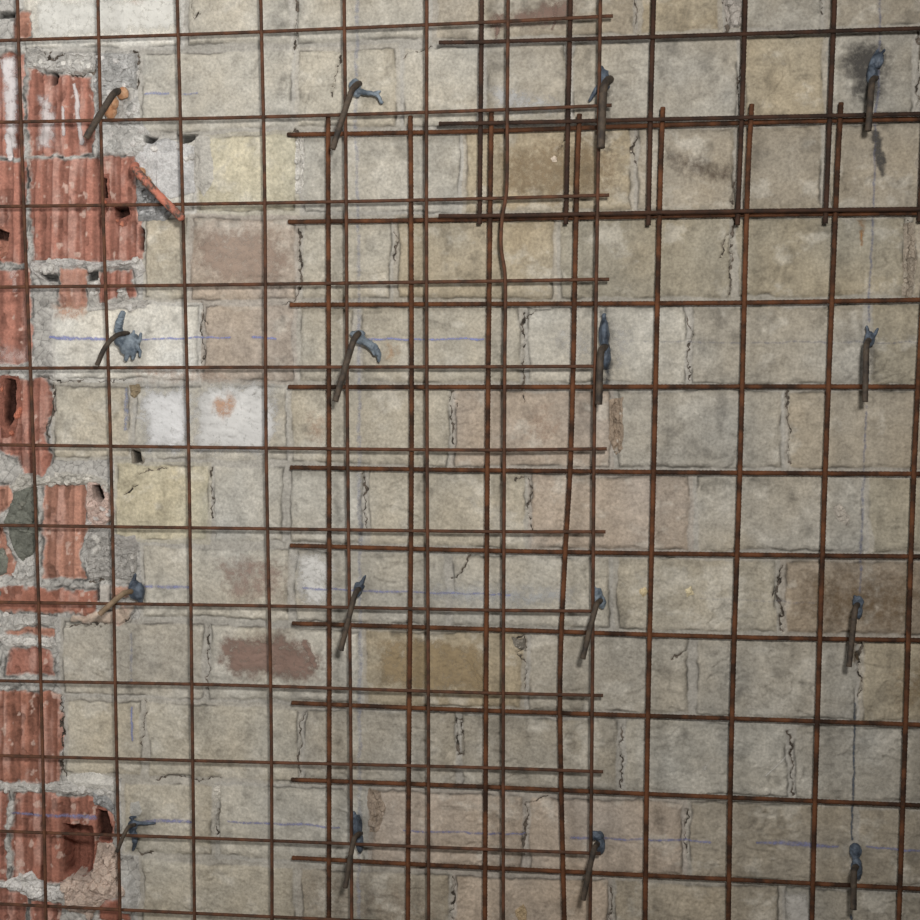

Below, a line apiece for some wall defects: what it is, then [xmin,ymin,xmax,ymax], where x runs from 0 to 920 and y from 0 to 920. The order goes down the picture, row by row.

spalling [599,0,920,226]
crack [719,182,735,297]
crack [686,316,694,381]
spalling [0,0,646,920]
crack [514,476,533,530]
spalling [588,211,920,920]
crack [772,565,785,632]
crack [297,711,307,776]
crack [455,718,465,755]
crack [786,730,795,796]